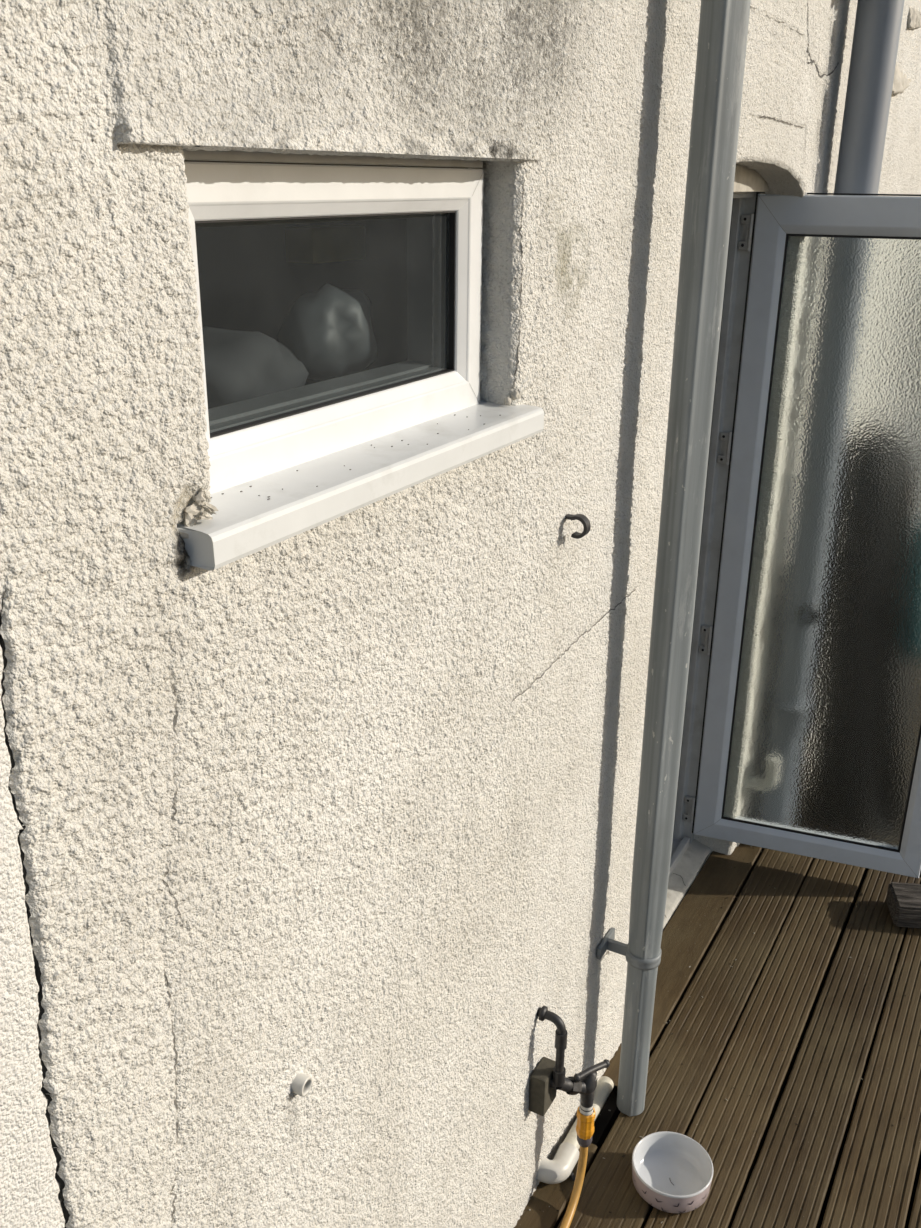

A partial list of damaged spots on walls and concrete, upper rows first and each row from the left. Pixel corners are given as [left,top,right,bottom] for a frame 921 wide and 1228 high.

crack [807,3,839,78]
flaking render [176,488,218,576]
crack [0,584,70,1228]